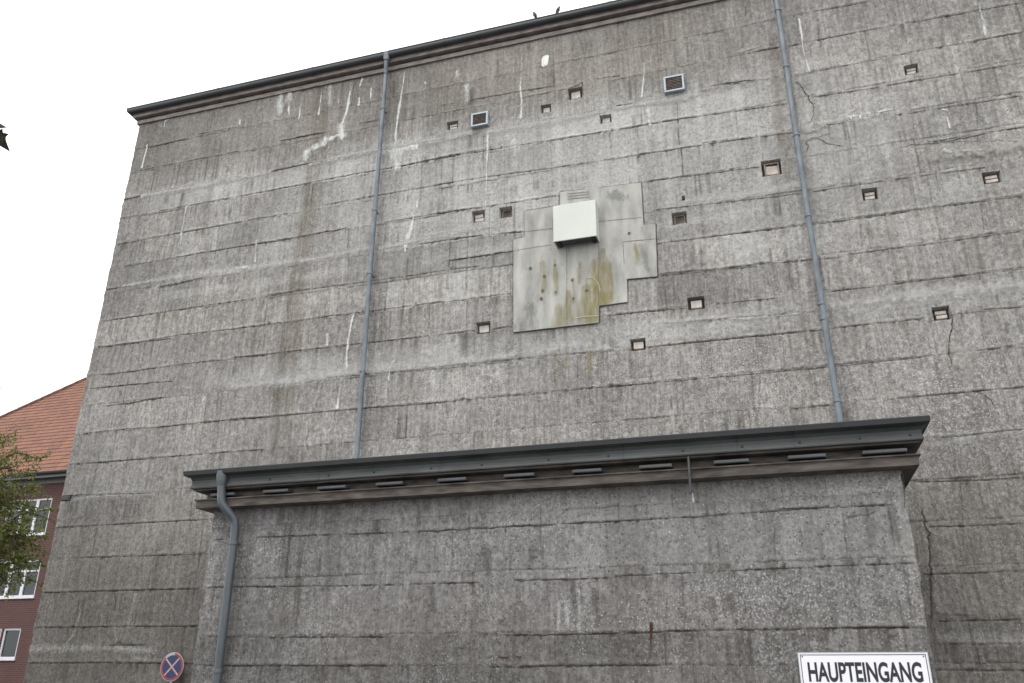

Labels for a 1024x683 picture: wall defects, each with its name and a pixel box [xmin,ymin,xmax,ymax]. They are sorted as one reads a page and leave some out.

leakage [277,92,301,119]
leakage [303,77,382,161]
crack [796,82,839,152]
crack [948,311,962,364]
crack [845,472,933,618]